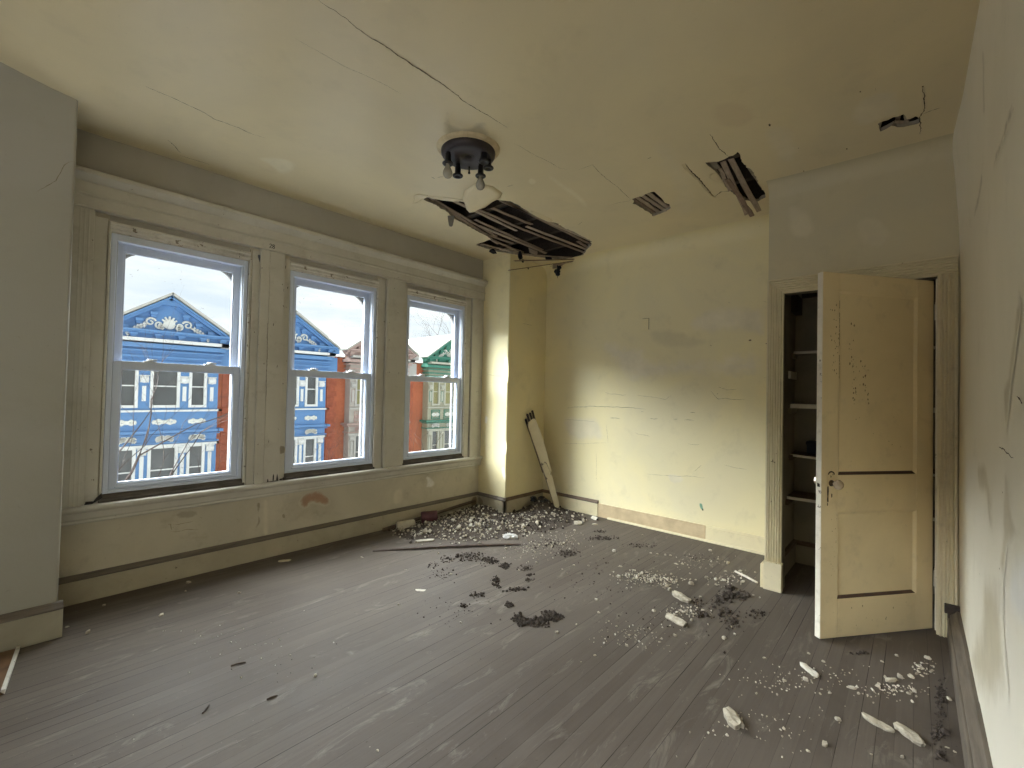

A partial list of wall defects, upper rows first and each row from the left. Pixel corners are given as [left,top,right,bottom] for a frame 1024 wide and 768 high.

crack [321,2,500,123]
crack [682,165,727,197]
peeling [427,183,502,213]